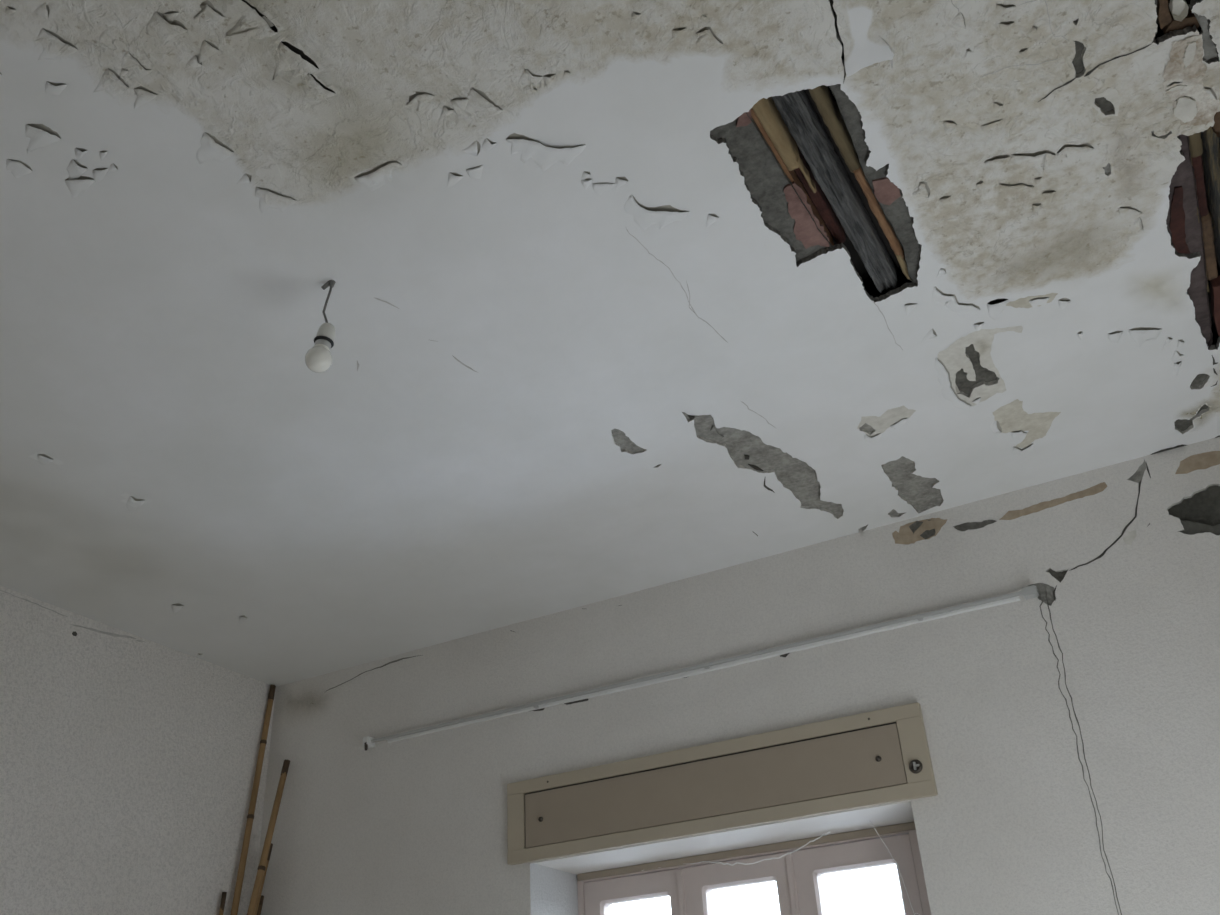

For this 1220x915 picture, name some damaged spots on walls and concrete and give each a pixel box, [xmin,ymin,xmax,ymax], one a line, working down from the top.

spalling [1072,41,1086,78]
peeling [1151,19,1220,156]
spalling [710,134,951,315]
peeling [976,143,1094,217]
spalling [920,268,1071,456]
spalling [611,429,646,454]
spalling [682,412,844,519]
peeling [857,405,916,443]
spalling [881,456,1107,545]
spalling [1167,484,1220,535]
peeling [1175,451,1220,474]
crack [1038,444,1186,915]